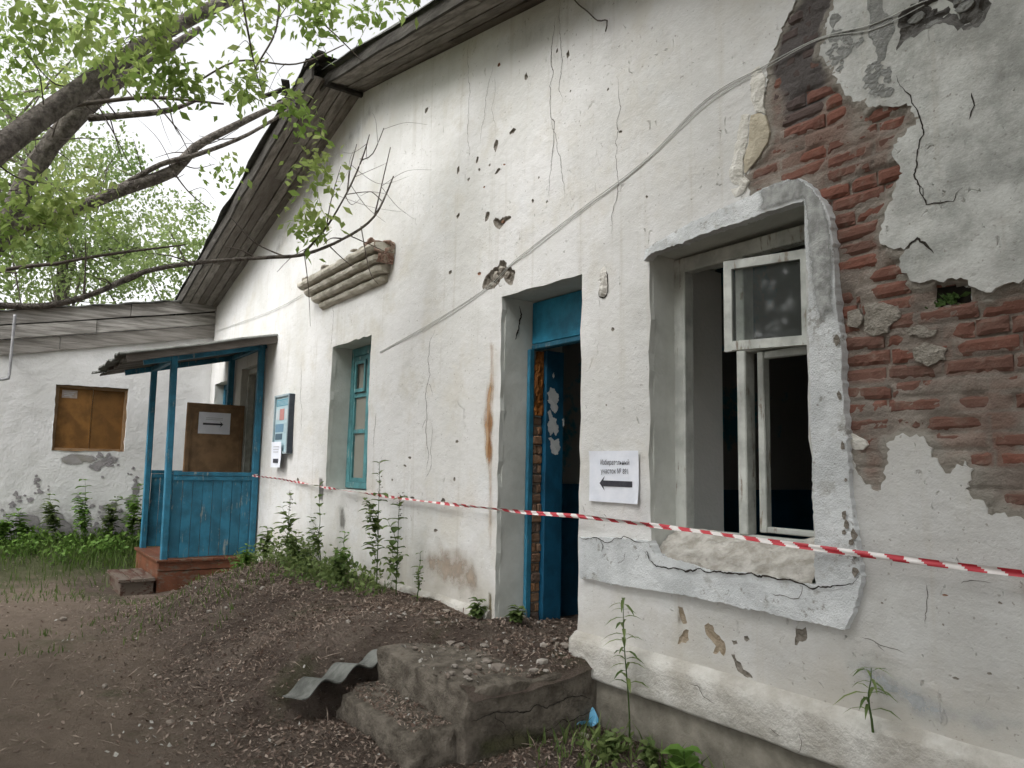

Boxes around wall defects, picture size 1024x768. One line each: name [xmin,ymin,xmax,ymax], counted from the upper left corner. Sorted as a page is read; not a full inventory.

crack [549,2,565,192]
crack [896,75,963,205]
spalling [478,260,515,290]
spalling [485,212,511,229]
spalling [729,0,1024,519]
crack [905,237,934,253]
peeling [0,452,142,539]
crack [581,536,859,599]
peeling [842,511,859,578]
peeling [678,606,689,644]
peeling [704,623,753,678]